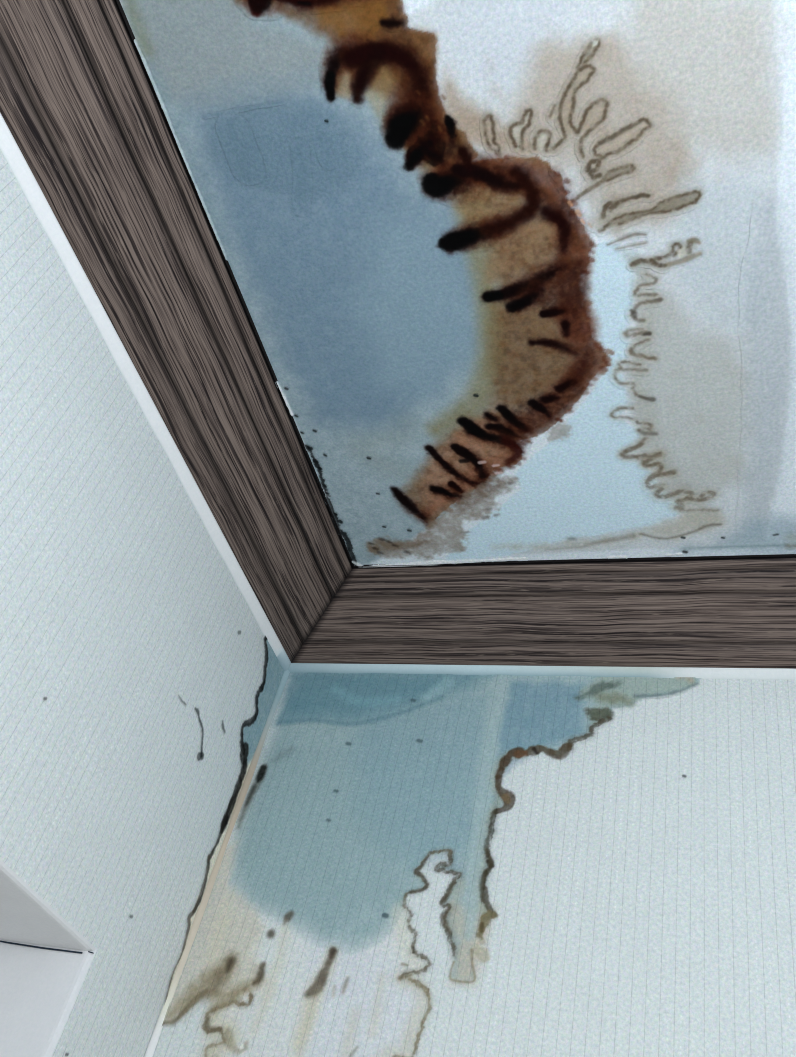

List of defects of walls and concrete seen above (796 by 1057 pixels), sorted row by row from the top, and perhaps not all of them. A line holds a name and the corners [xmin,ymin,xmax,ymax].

water stain [119,0,523,565]
water stain [409,0,796,557]
crack [178,694,226,762]
water stain [162,636,702,1057]